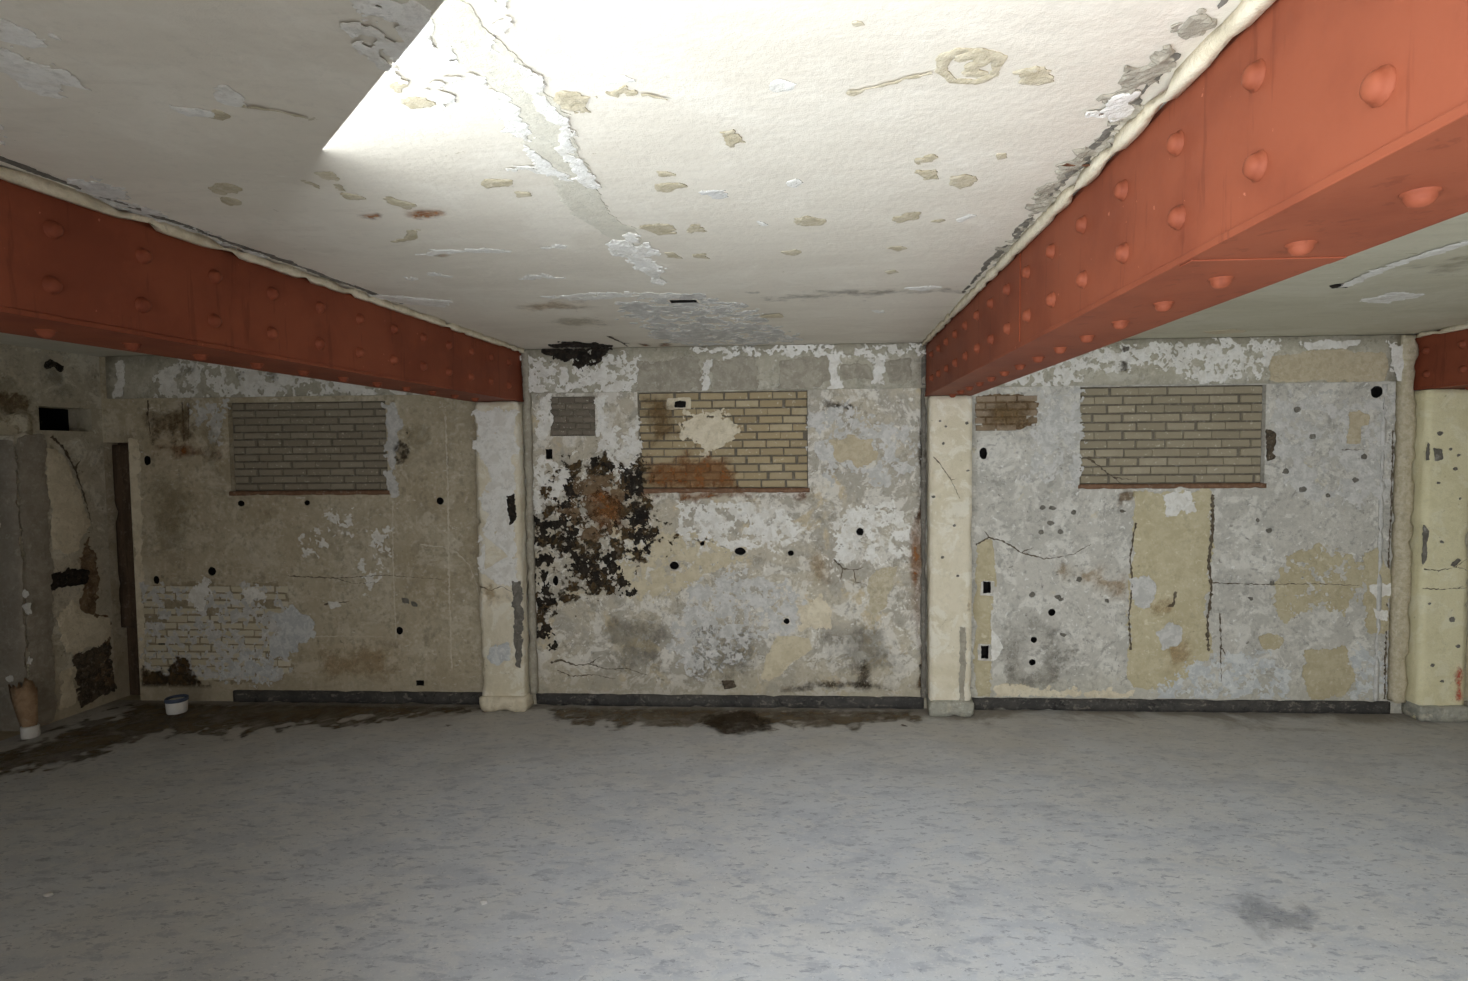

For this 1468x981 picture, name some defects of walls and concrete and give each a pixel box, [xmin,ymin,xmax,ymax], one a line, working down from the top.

peeling [553,85,638,114]
peeling [914,154,978,189]
spalling [962,0,1228,293]
crack [1338,241,1468,288]
peeling [128,438,316,689]
peeling [152,359,421,498]
mould [527,451,679,651]
peeling [471,273,926,689]
peeling [965,337,1361,535]
peeling [956,488,1391,701]
spalling [1421,525,1444,564]
spalling [1426,431,1461,484]